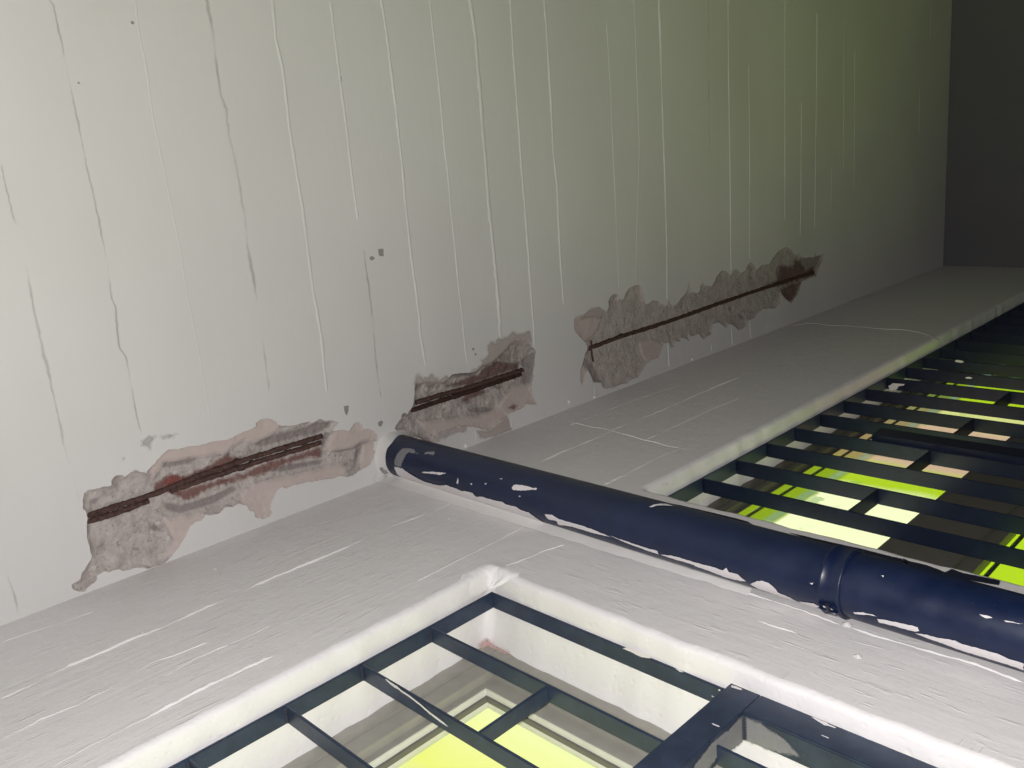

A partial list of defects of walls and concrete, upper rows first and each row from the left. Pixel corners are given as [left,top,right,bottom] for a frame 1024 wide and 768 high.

spalling [395,332,537,442]
spalling [574,247,823,389]
spalling [72,406,383,592]